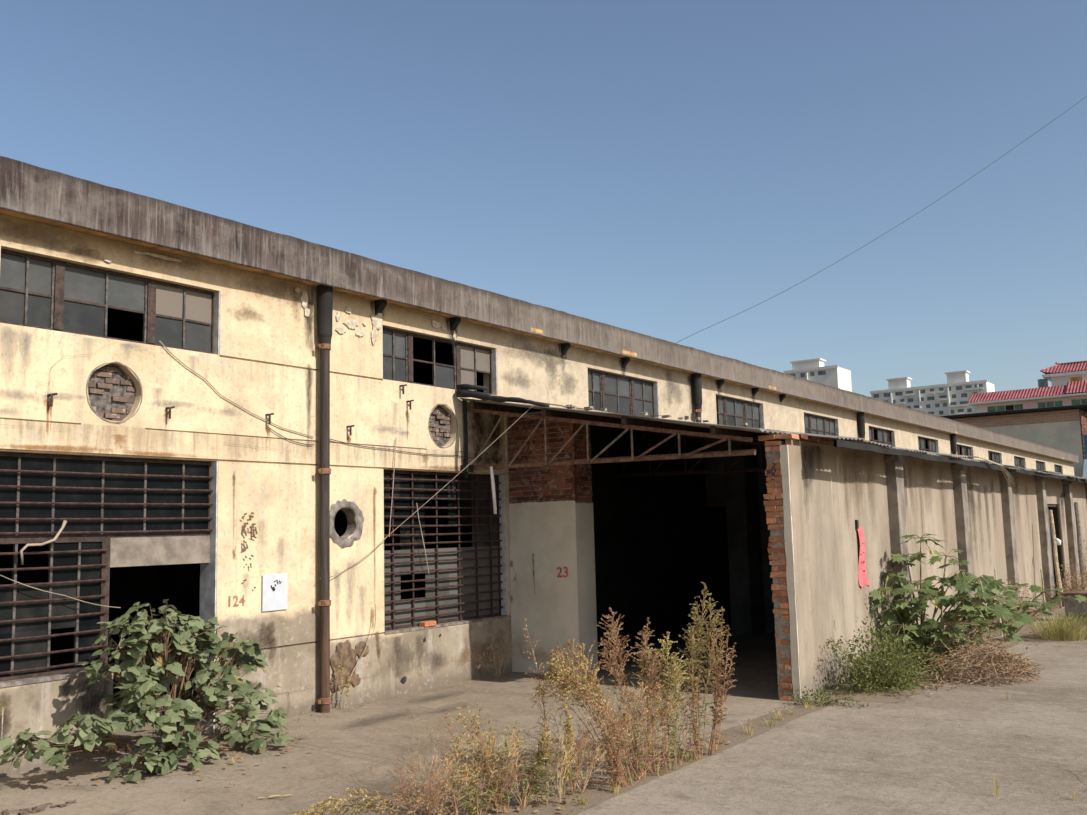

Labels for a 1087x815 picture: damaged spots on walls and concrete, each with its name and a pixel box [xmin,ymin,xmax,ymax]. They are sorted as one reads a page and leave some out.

peeling [295,287,310,317]
peeling [335,306,383,345]